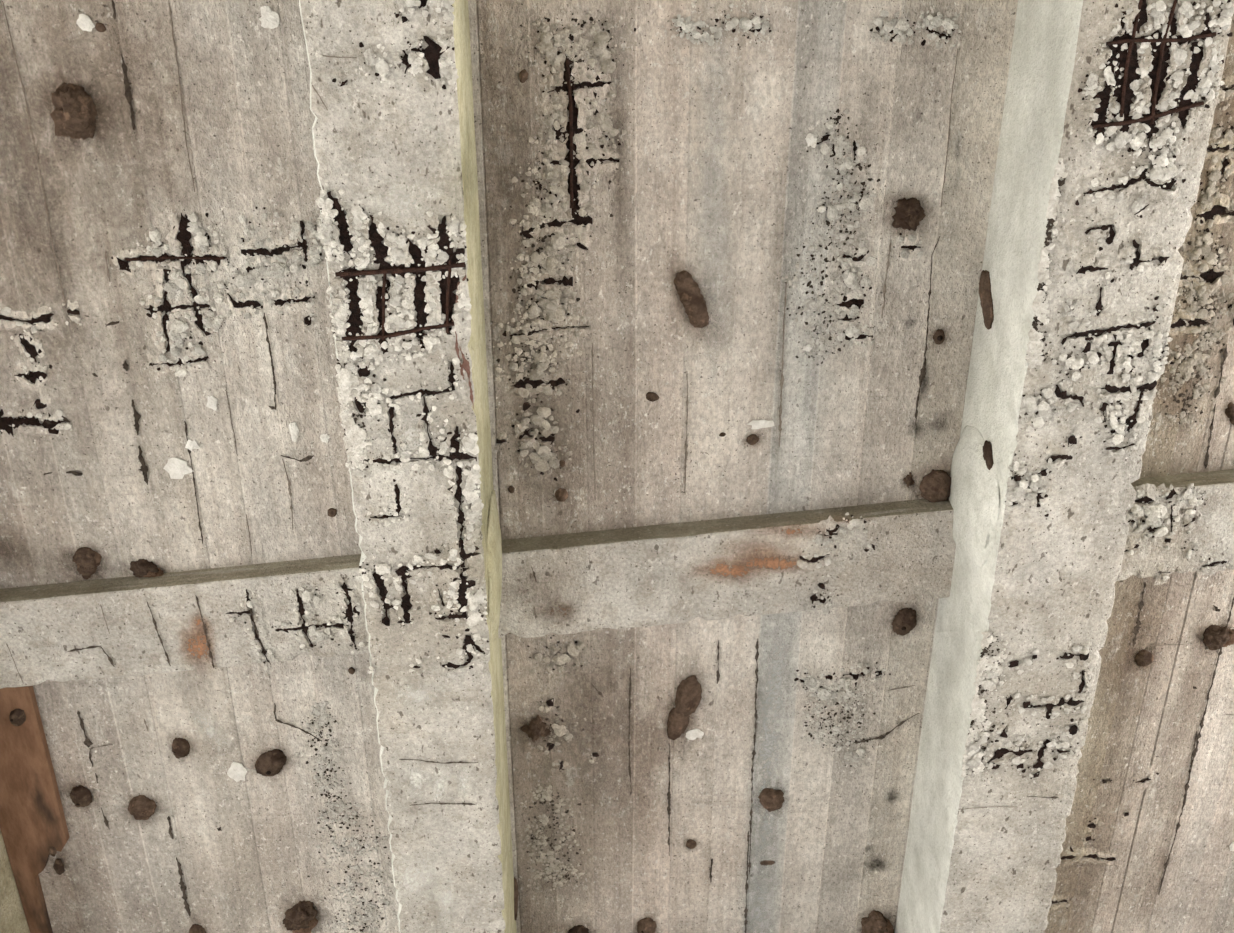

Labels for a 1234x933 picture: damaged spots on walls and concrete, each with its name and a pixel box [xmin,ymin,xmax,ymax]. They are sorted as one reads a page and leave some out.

spalling [491,13,639,481]
spalling [785,109,882,366]
spalling [893,230,923,261]
spalling [1005,0,1234,517]
spalling [107,186,490,679]
corrosion [705,546,799,579]
spalling [1123,483,1229,585]
spalling [964,636,1095,784]